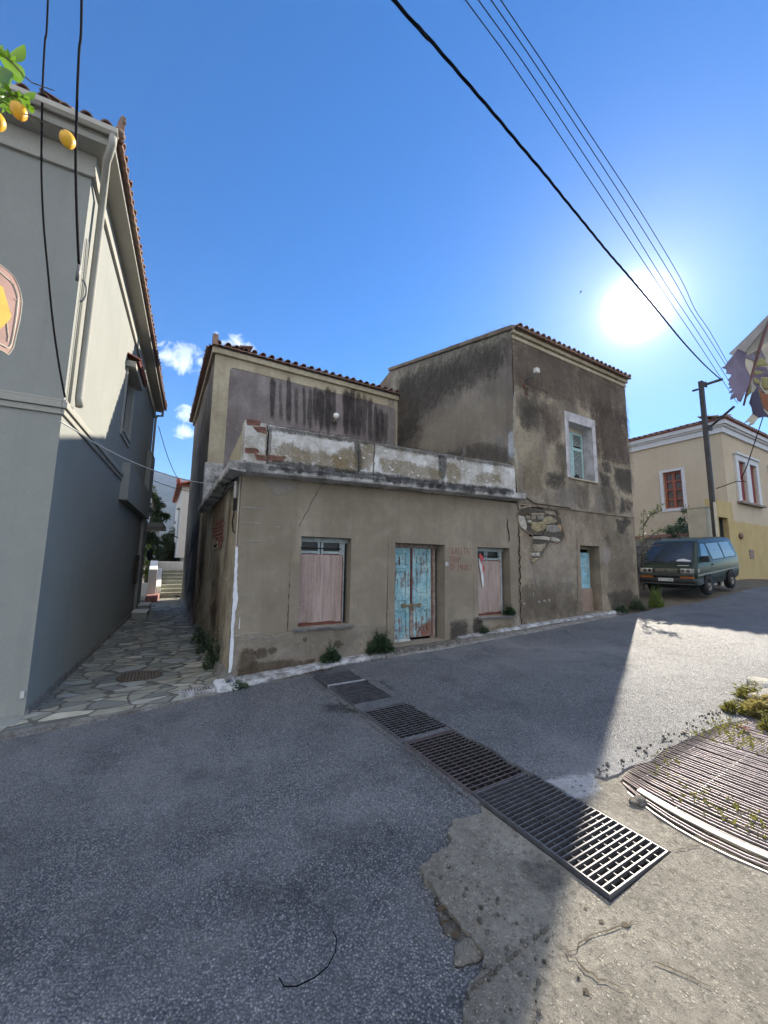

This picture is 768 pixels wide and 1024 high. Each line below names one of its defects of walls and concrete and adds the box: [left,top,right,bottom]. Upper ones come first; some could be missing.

flaking render [246,419,267,434]
peeling [245,434,510,485]
leakage [245,336,633,534]
spalling [516,452,570,564]
spalling [434,897,484,967]